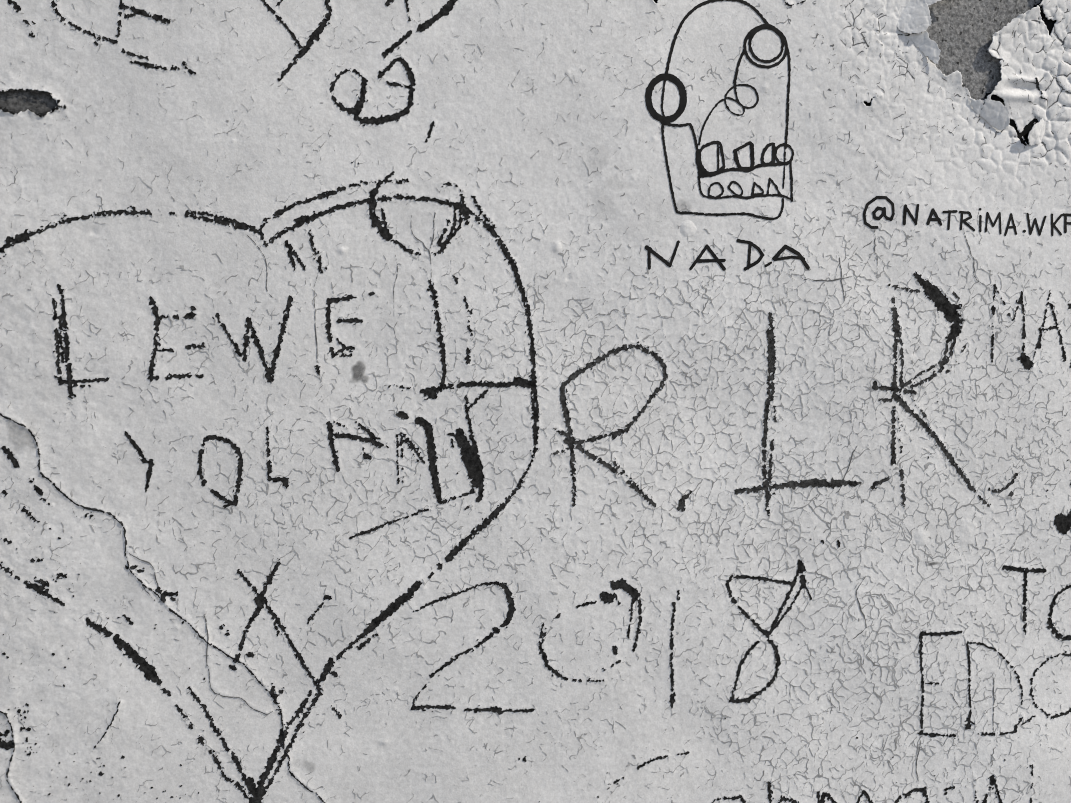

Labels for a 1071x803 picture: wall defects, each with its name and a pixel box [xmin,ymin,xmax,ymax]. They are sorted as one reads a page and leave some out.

spalling [0,88,66,117]
peeling [897,0,1057,146]
crack [411,213,436,278]
crack [801,230,878,301]
crack [313,275,321,383]
crack [0,413,325,803]
crack [853,579,867,639]
crack [989,674,997,766]